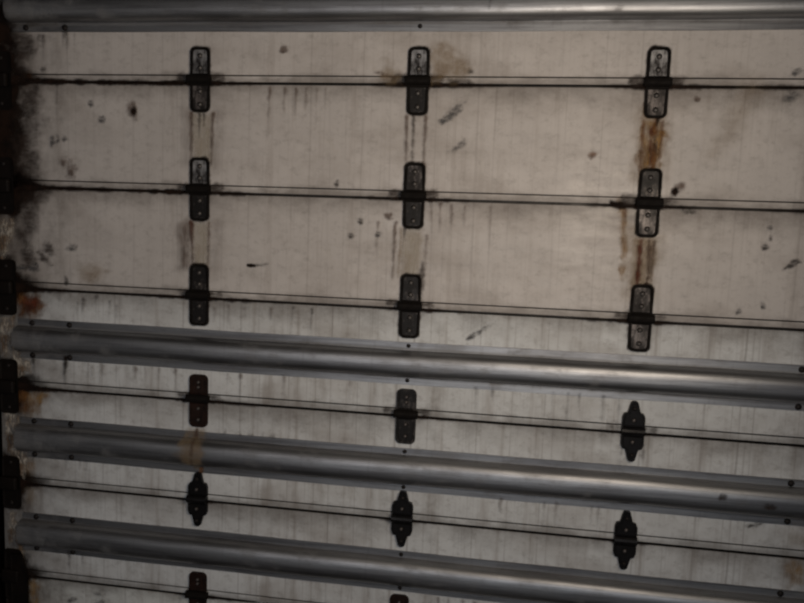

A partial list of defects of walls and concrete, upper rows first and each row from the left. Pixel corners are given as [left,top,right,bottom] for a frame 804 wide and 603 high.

corrosion [640,118,665,168]
corrosion [636,245,654,284]
corrosion [19,295,43,315]